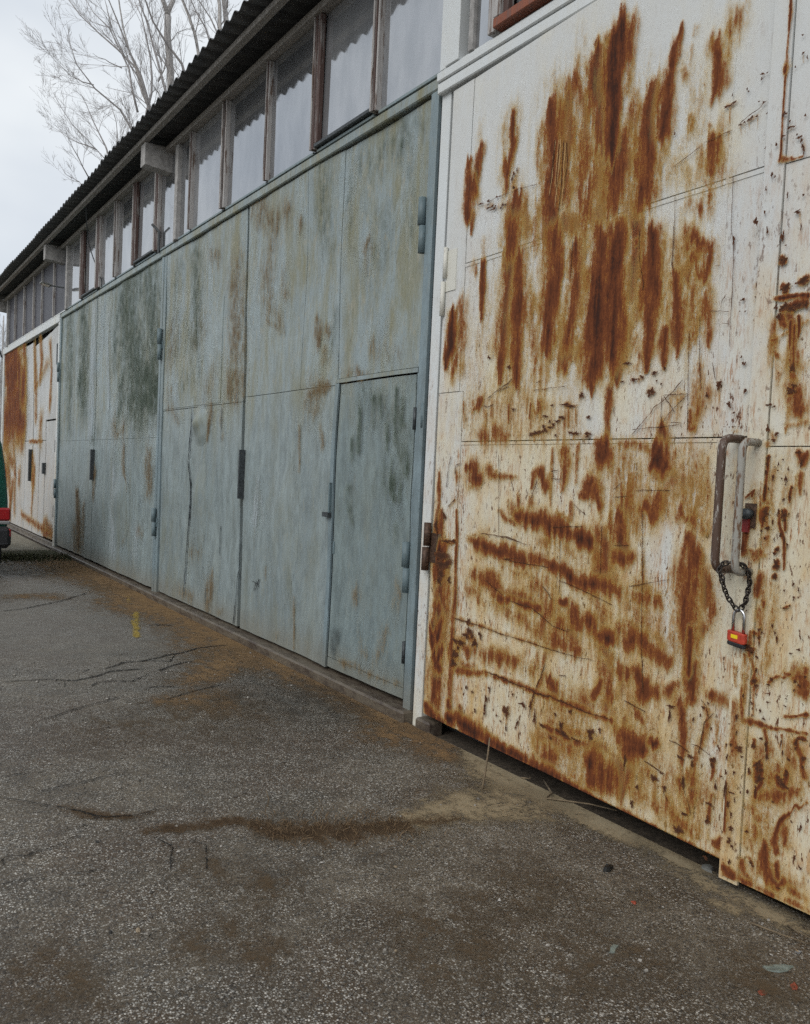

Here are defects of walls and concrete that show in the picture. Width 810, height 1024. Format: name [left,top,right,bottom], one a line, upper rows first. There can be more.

rust [3,334,53,540]
water stain [137,356,159,432]
crack [183,409,192,597]
rust [314,315,329,360]
water stain [350,385,405,461]
rust [423,0,810,913]